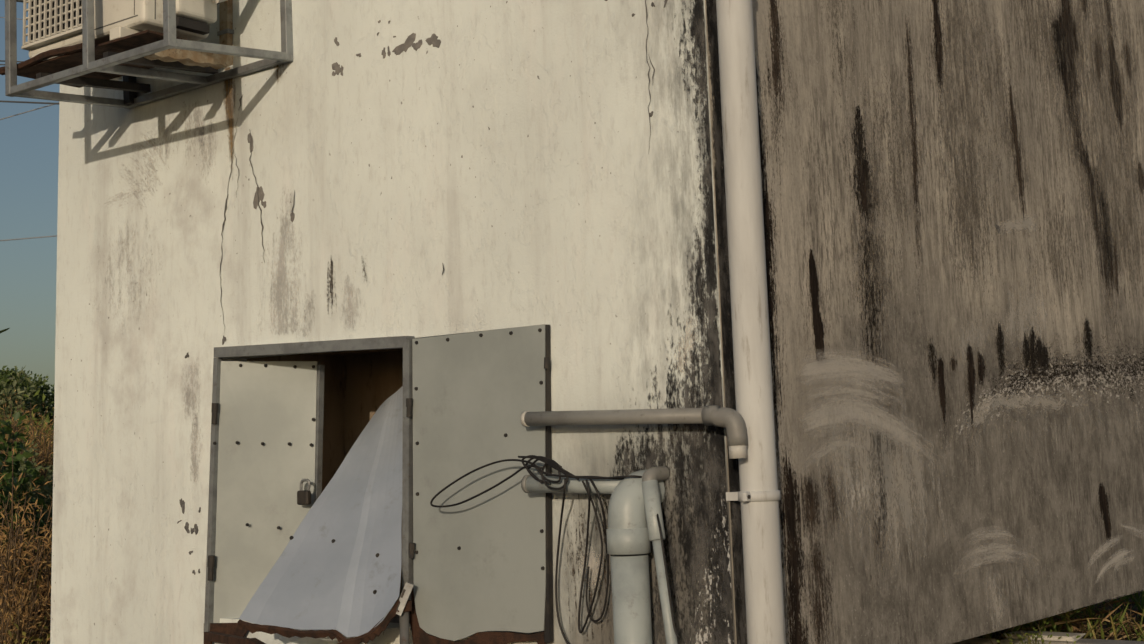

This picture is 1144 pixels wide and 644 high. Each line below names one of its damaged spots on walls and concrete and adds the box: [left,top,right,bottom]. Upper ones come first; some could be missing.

peeling [332,62,344,76]
peeling [377,20,441,59]
damp [767,0,785,121]
crack [220,95,295,330]
mould [635,0,736,410]
damp [927,0,1144,298]
damp [801,20,926,644]
damp [928,318,1144,441]
rust [204,588,546,644]
mould [567,494,613,640]
mould [613,424,747,644]
damp [1092,483,1128,577]